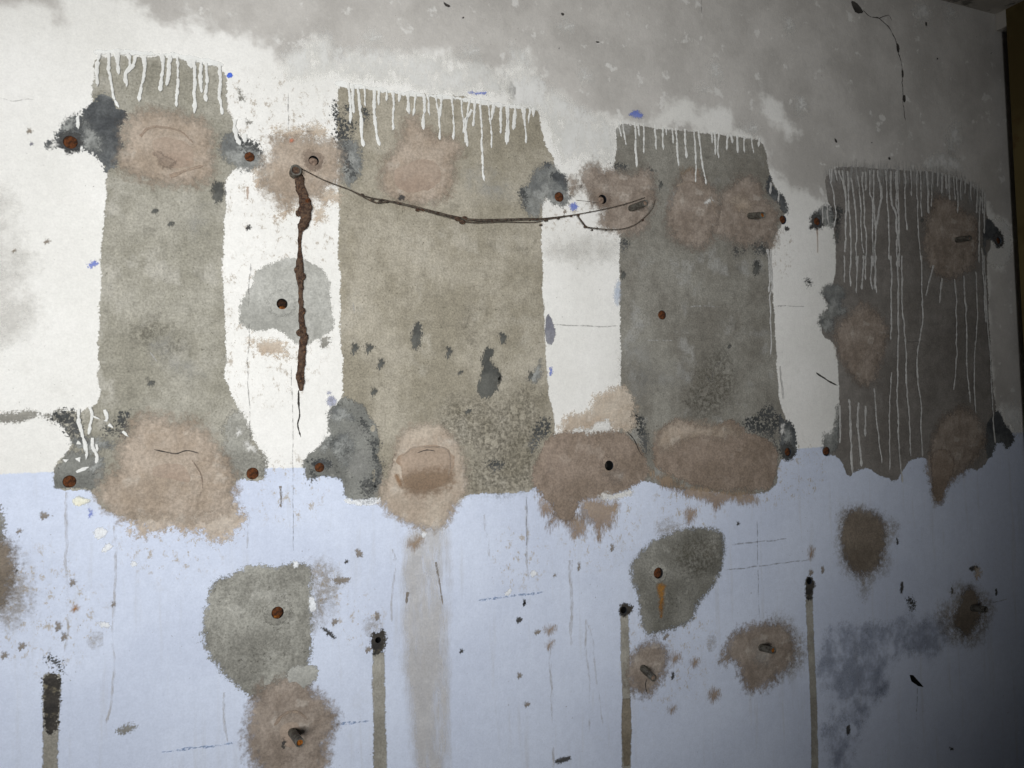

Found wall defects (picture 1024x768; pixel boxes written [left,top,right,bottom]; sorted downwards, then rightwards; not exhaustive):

crack [851,1,906,120]
leakage [44,92,128,173]
leakage [218,132,266,173]
leakage [329,99,373,187]
leakage [519,161,571,221]
leakage [766,175,789,214]
rust [294,174,313,391]
leakage [805,276,847,334]
leakage [50,407,134,473]
leakage [302,397,385,506]
leakage [742,402,798,457]
leakage [985,410,1015,458]